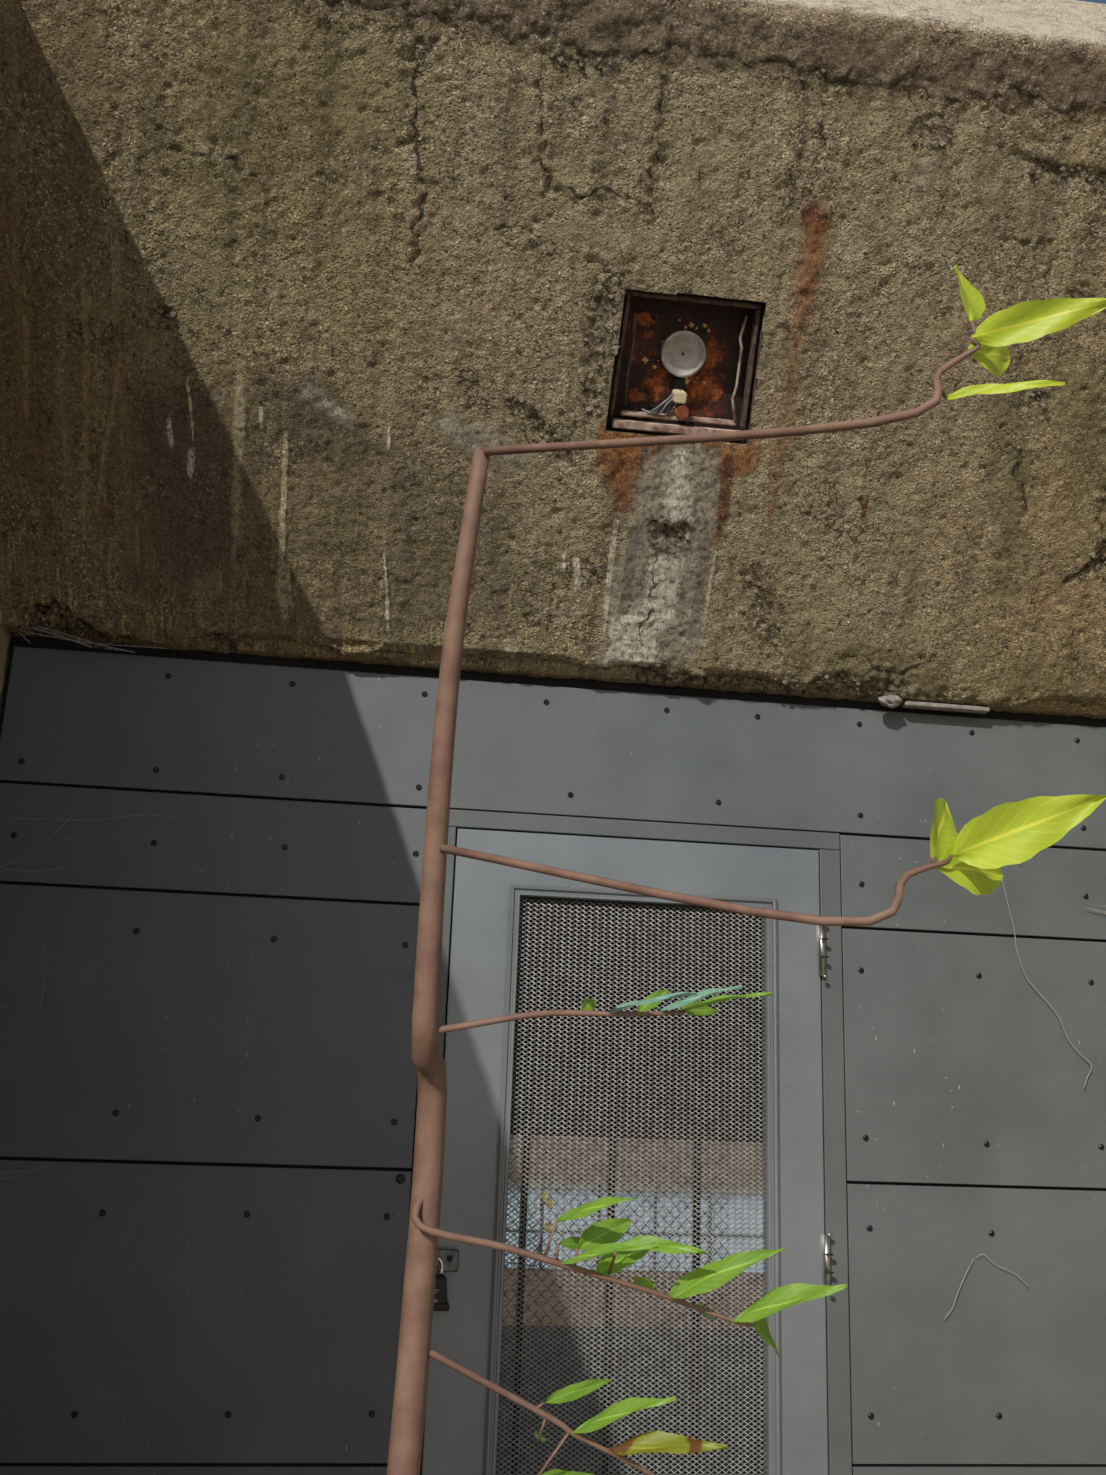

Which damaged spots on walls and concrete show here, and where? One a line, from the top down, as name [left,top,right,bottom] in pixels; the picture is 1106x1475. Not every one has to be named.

crack [167,147,279,186]
crack [322,0,1106,266]
rust [798,201,834,306]
rust [628,322,723,404]
rust [598,428,679,519]
rust [703,442,759,540]
damp [598,446,718,668]